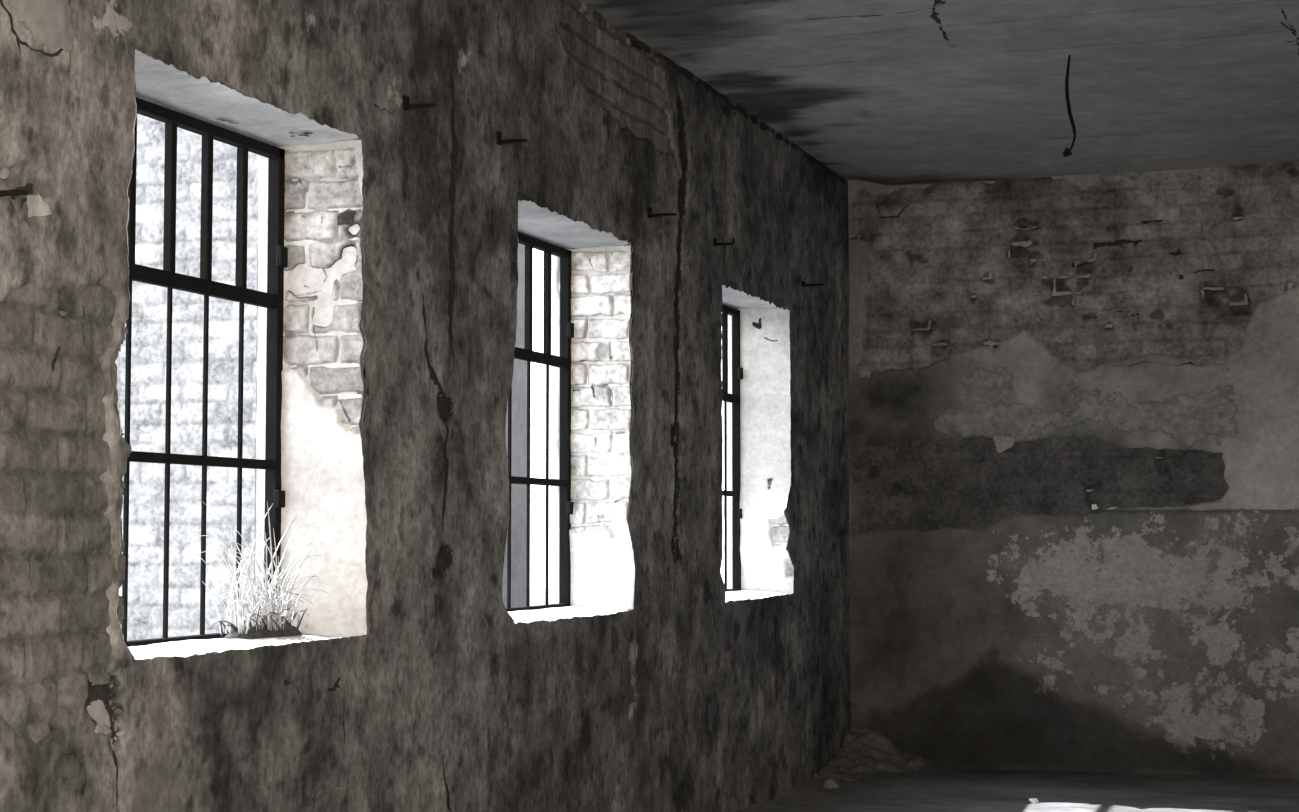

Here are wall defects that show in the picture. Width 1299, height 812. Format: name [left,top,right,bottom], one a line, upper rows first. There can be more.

water stain [610,0,774,40]
crack [806,0,953,46]
crack [1277,4,1299,55]
water stain [705,73,857,145]
flaking render [276,132,369,434]
flaking render [849,160,1299,378]
spalling [849,435,1299,761]